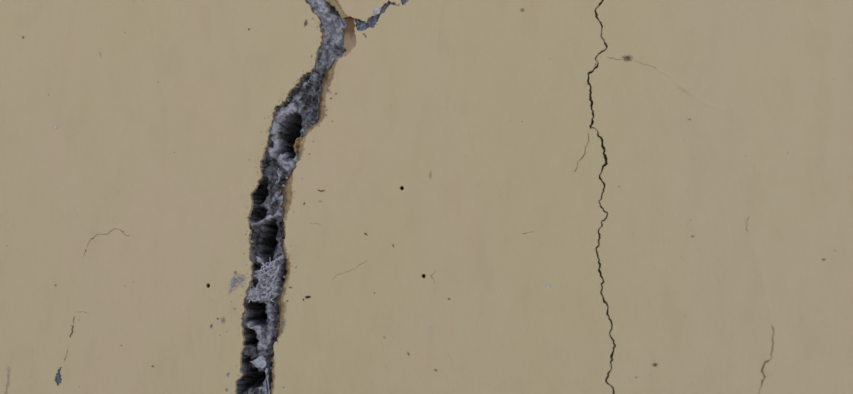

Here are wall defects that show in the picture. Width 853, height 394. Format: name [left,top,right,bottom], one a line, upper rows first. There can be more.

peeling [53,365,64,388]
crack [575,0,621,394]